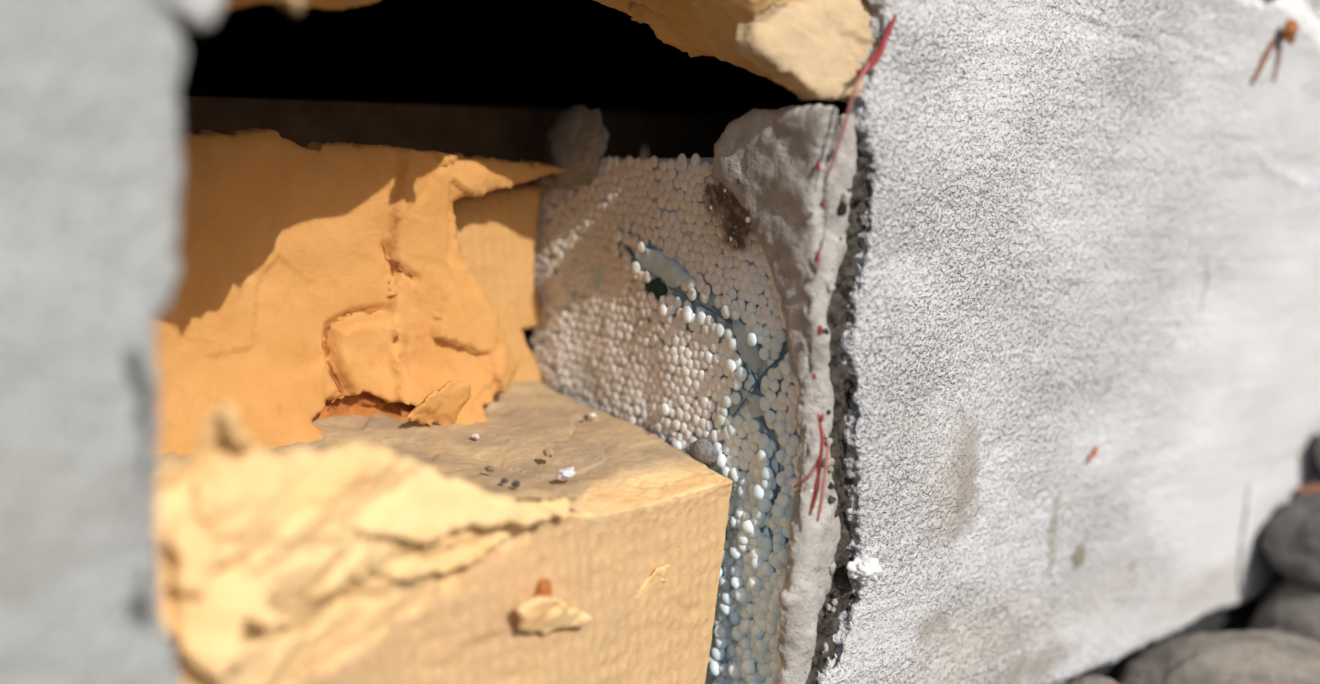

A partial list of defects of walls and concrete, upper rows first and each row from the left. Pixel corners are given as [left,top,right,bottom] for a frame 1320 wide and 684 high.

peeling [156,0,226,30]
crack [1235,0,1320,51]
spalling [645,278,668,300]
spalling [846,554,883,585]
peeling [516,578,592,635]